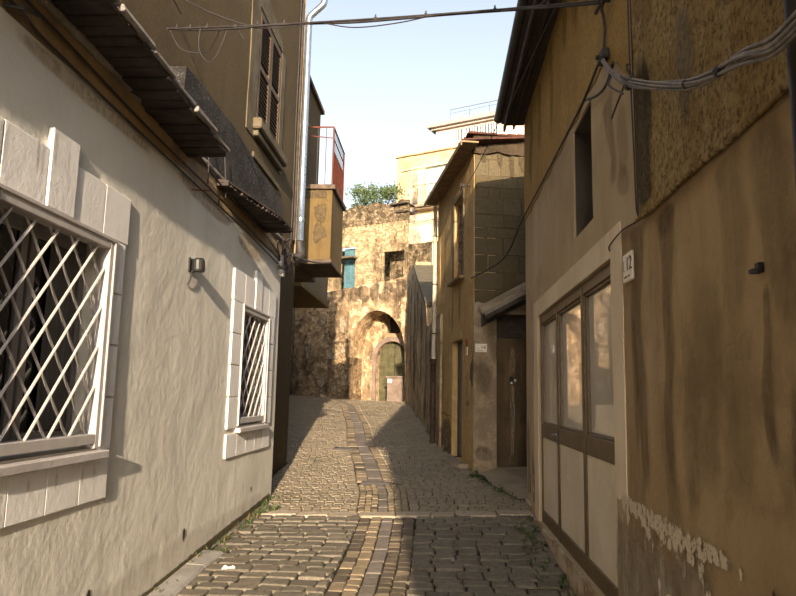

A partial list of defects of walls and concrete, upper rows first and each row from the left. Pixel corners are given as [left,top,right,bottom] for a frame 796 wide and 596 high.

damp [634,64,651,206]
peeling [617,492,730,596]